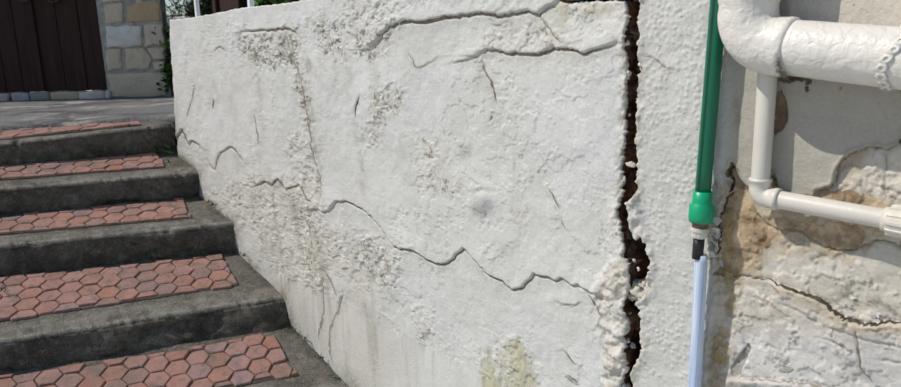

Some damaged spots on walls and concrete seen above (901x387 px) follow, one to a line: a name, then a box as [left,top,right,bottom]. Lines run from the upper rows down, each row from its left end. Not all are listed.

crack [247,26,296,34]
crack [177,85,241,170]
crack [255,64,322,201]
crack [342,201,602,318]
crack [382,0,673,353]
spalling [707,163,865,277]
crack [763,221,898,251]
spalling [813,187,890,208]
crack [826,144,901,203]
crack [318,273,342,361]
crack [737,275,901,382]
crack [743,377,819,387]